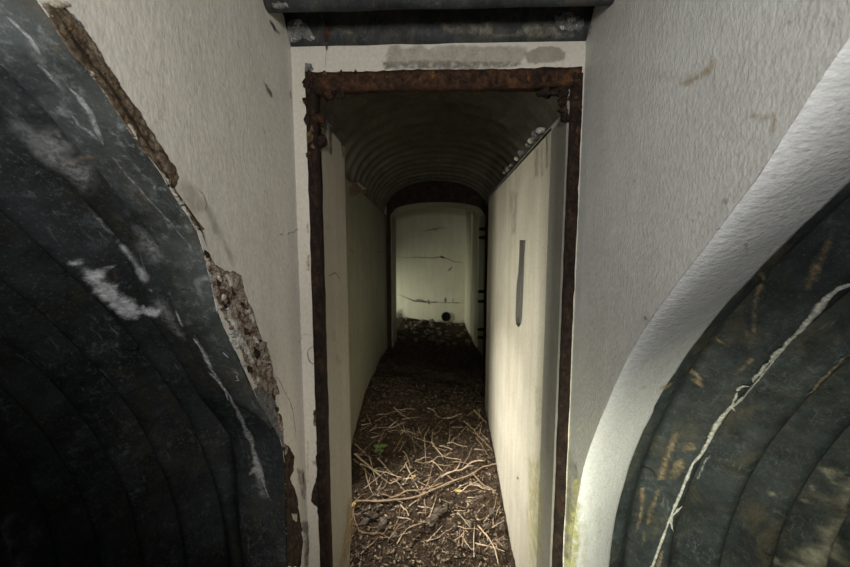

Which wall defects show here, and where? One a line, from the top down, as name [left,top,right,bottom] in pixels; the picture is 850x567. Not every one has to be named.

water stain [526,47,565,63]
flaking render [36,0,204,231]
corrosion [302,69,315,169]
corrosion [567,127,581,215]
flaking render [203,250,307,567]
corrosion [660,434,684,478]